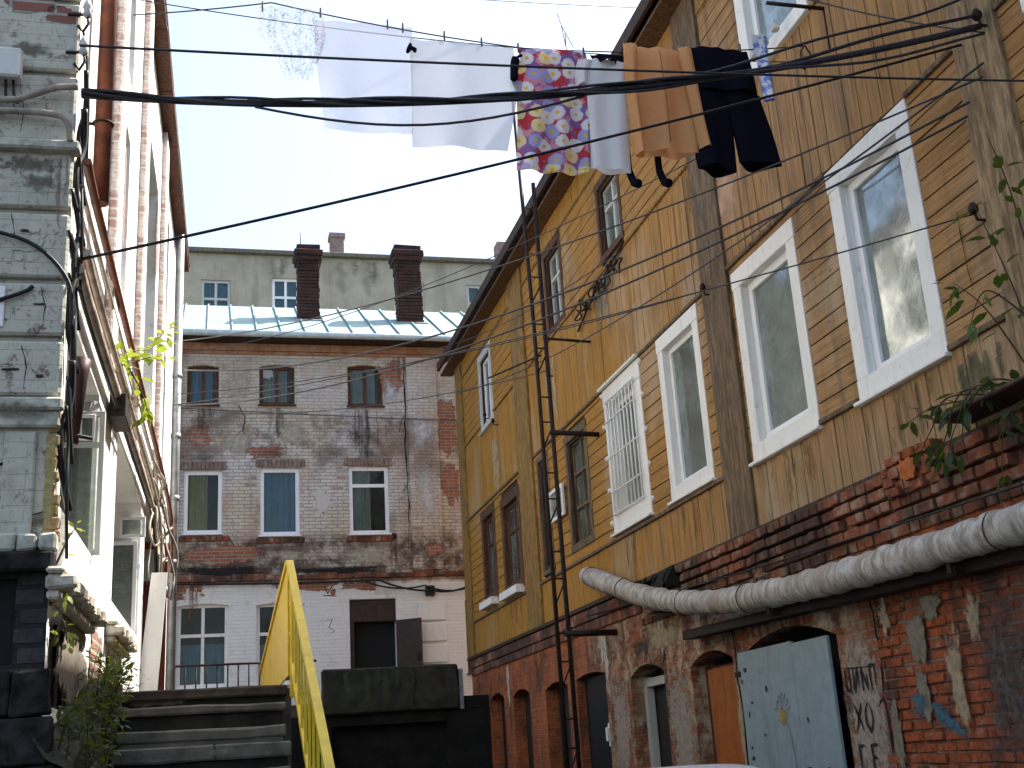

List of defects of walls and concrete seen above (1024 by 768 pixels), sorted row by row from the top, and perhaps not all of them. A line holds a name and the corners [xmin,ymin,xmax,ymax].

spalling [42,412,62,543]
damp [412,416,433,448]
flaking render [437,399,460,507]
flaking render [298,580,396,597]
flaking render [843,571,1024,768]